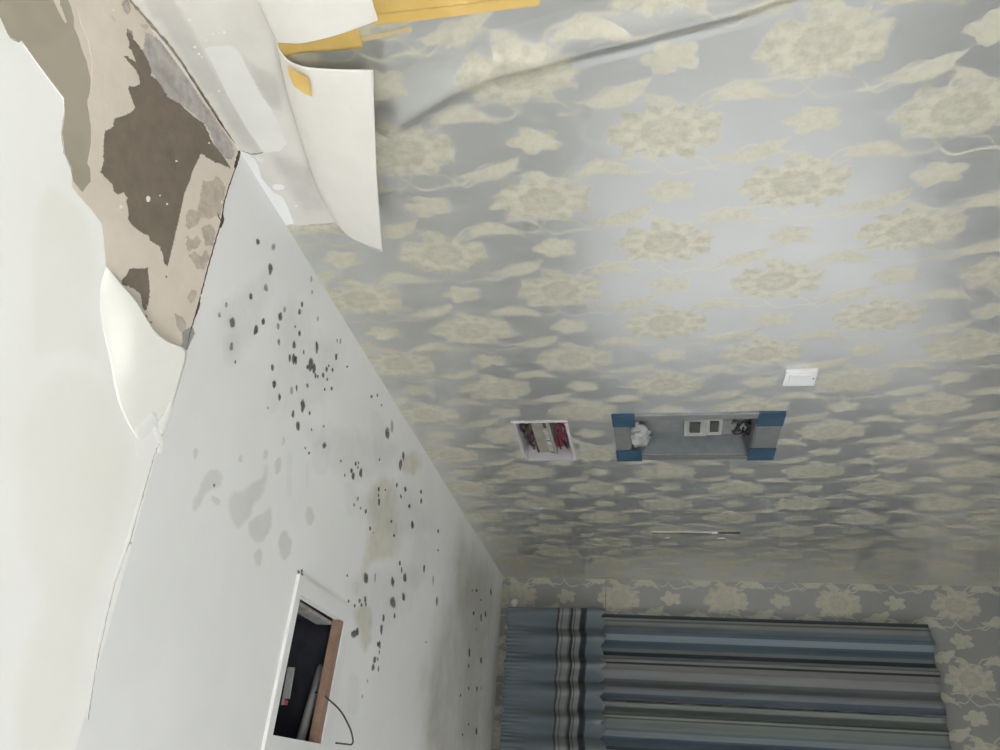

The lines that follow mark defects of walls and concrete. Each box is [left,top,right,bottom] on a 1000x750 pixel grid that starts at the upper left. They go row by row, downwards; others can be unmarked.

peeling [0,0,238,434]
water stain [219,315,243,371]
water stain [191,436,293,567]
water stain [264,365,282,414]
water stain [292,401,342,487]
water stain [289,326,348,391]
crack [86,432,164,720]
water stain [343,394,503,750]